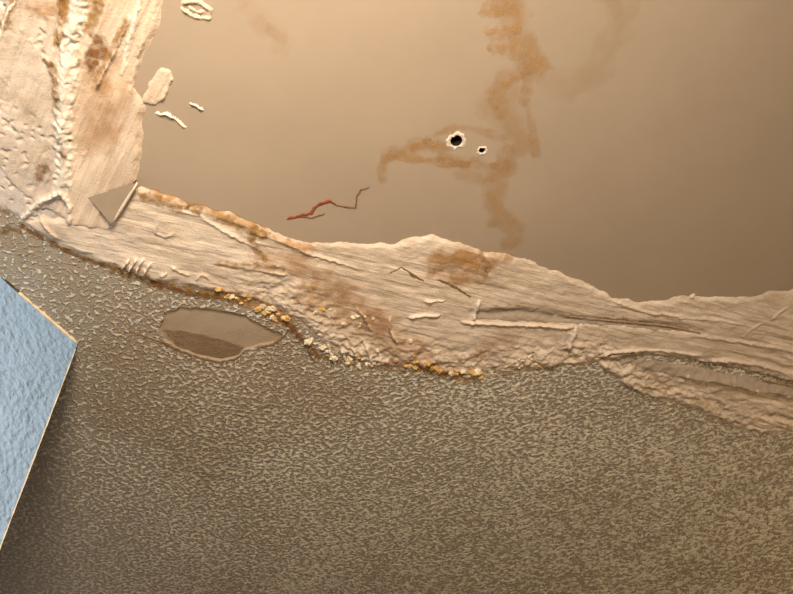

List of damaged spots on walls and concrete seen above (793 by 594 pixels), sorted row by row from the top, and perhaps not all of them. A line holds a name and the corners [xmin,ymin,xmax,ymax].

spalling [446,131,466,151]
crack [287,187,368,219]
corrosion [431,251,490,283]
corrosion [2,224,340,362]
spalling [129,287,291,363]
peeling [304,338,382,370]
corrosion [352,359,469,381]
peeling [398,360,484,379]